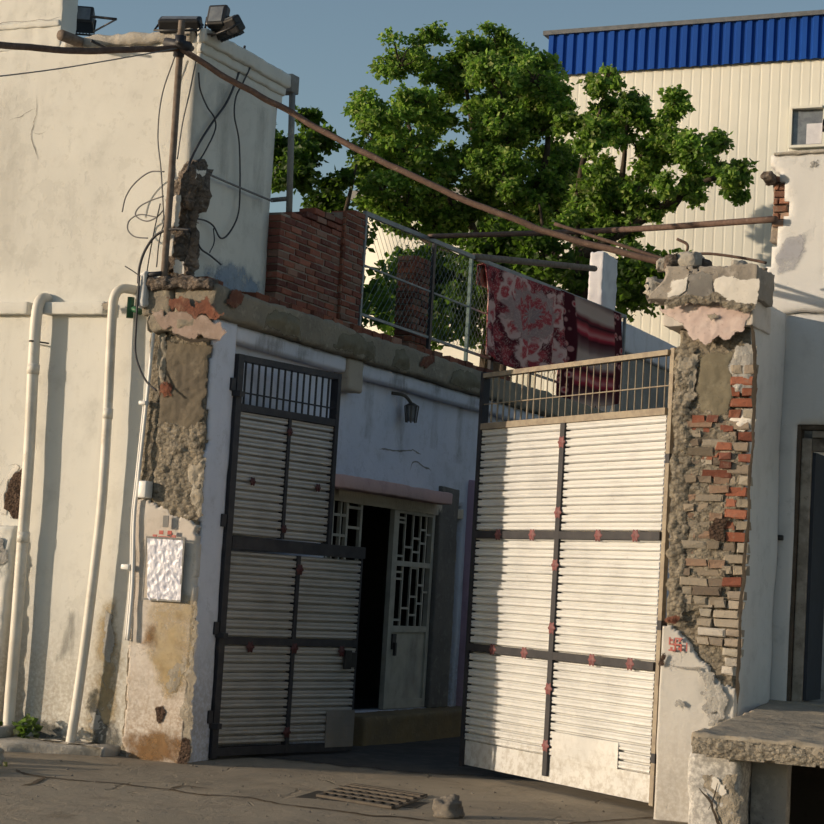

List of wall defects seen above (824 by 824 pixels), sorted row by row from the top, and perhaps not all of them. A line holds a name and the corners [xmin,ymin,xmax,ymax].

flaking render [138,159,510,521]
flaking render [1,464,22,519]
flaking render [643,271,760,727]
damp [87,604,121,750]
damp [143,601,193,695]
crack [16,769,425,820]
crack [569,816,654,824]
spalling [692,737,824,768]